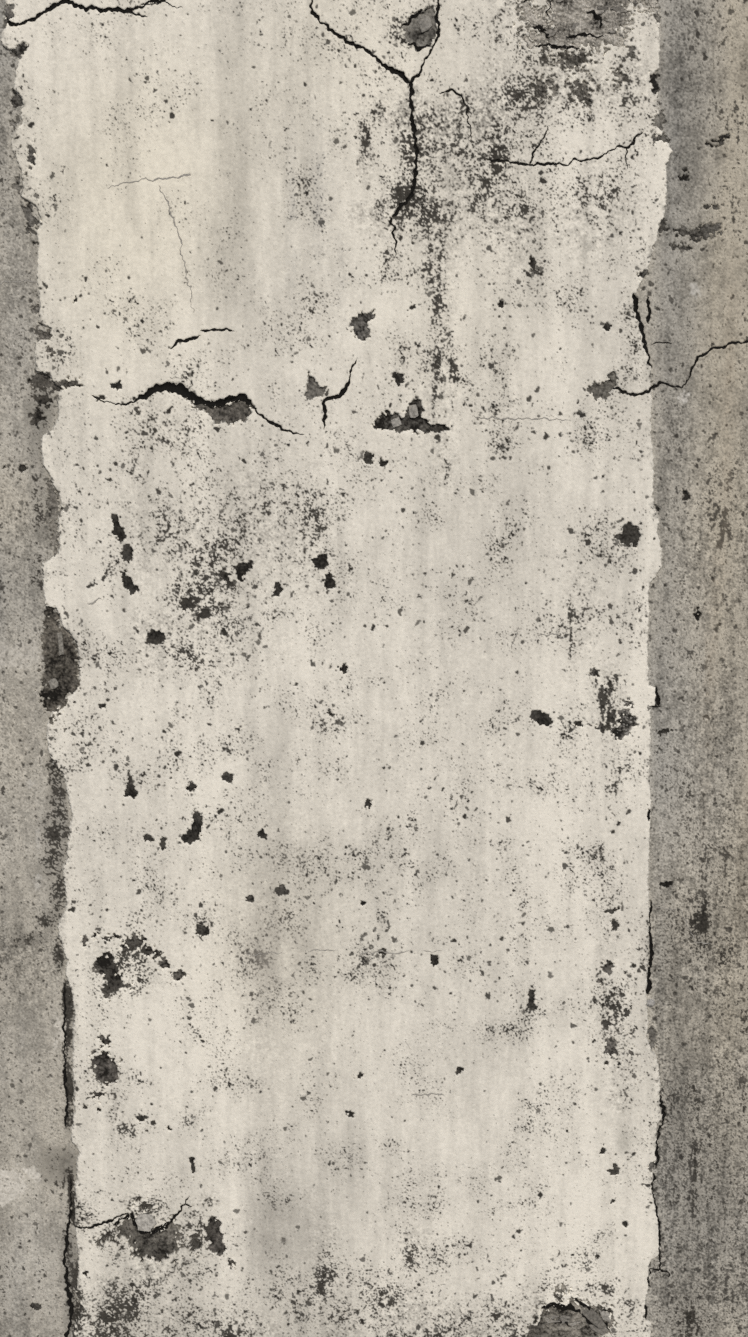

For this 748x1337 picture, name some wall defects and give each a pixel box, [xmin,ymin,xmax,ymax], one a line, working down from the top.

crack [6,0,183,26]
spalling [514,0,660,64]
crack [309,0,643,255]
spalling [651,80,670,144]
crack [109,174,232,349]
crack [92,359,357,435]
crack [613,340,748,396]
spalling [35,607,81,724]
spalling [96,1213,236,1267]
spalling [534,1283,617,1337]